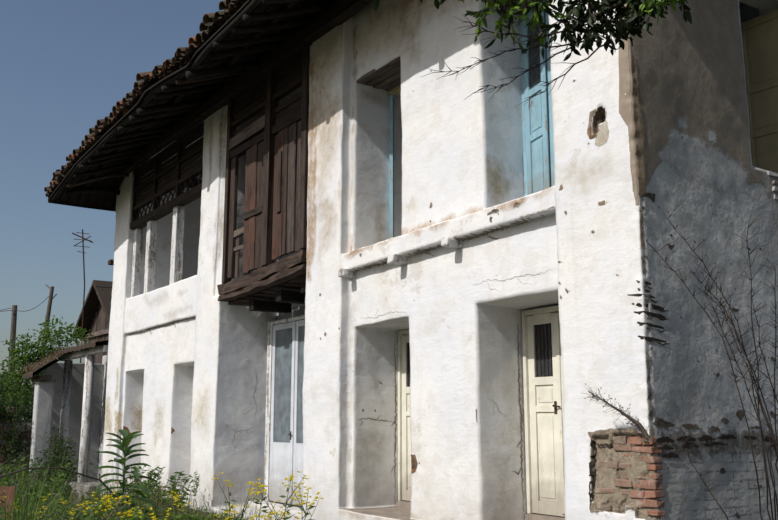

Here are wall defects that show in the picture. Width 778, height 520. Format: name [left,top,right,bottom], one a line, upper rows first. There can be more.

peeling [588,121,609,147]
flaking render [618,0,778,274]
water stain [306,158,316,277]
spalling [643,284,700,430]
crack [359,344,397,493]
spalling [588,428,647,446]
spalling [710,410,746,432]